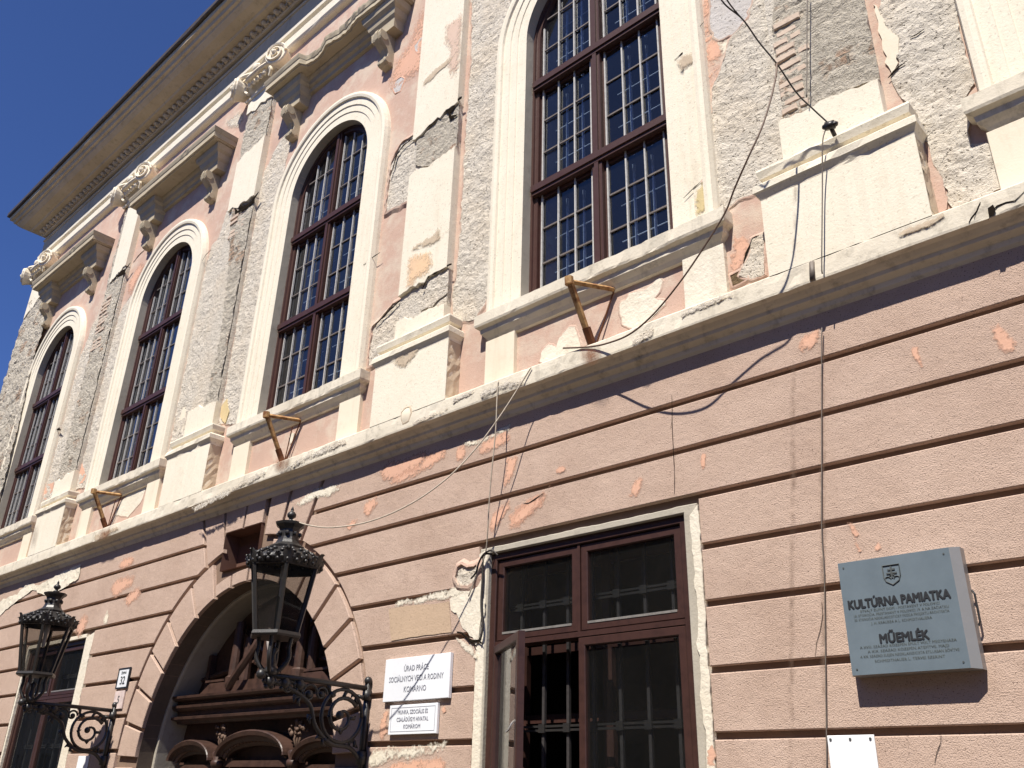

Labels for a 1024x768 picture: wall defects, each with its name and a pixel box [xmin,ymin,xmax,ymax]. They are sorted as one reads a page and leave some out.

spalling [704,0,1000,217]
spalling [366,0,512,372]
spalling [204,135,293,426]
peeling [799,330,819,351]
peeling [993,324,1016,351]
spalling [0,298,44,492]
peeling [380,424,510,485]
peeling [489,493,546,531]
spalling [0,564,81,615]
peeling [112,556,141,606]
peeling [389,557,485,658]